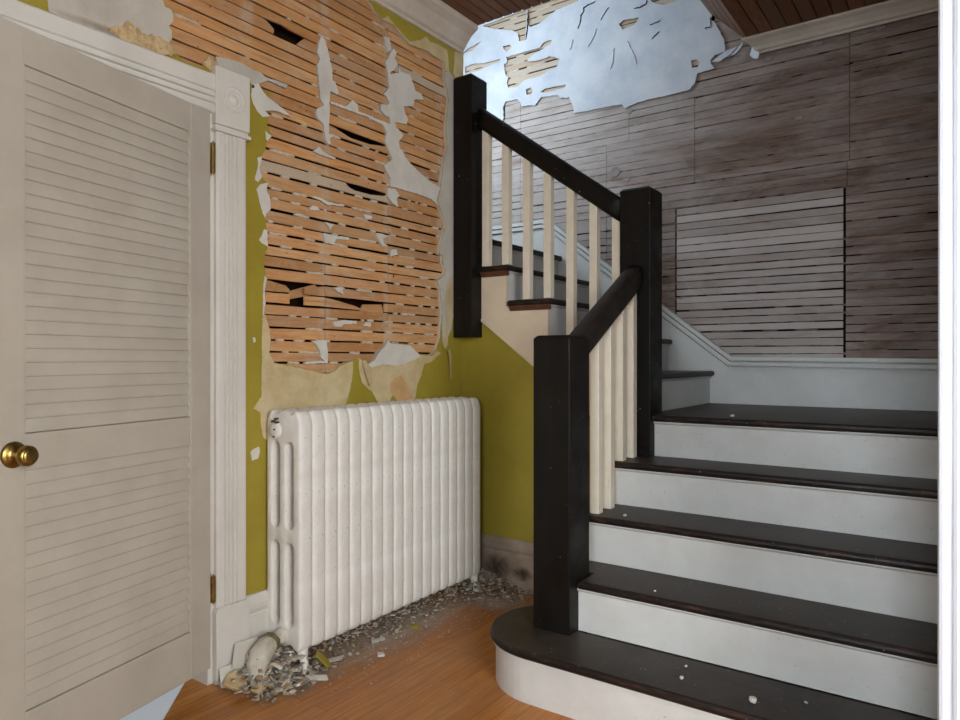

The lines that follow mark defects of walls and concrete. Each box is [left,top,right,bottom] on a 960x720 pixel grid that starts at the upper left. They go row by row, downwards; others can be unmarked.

flaking render [47,0,938,461]